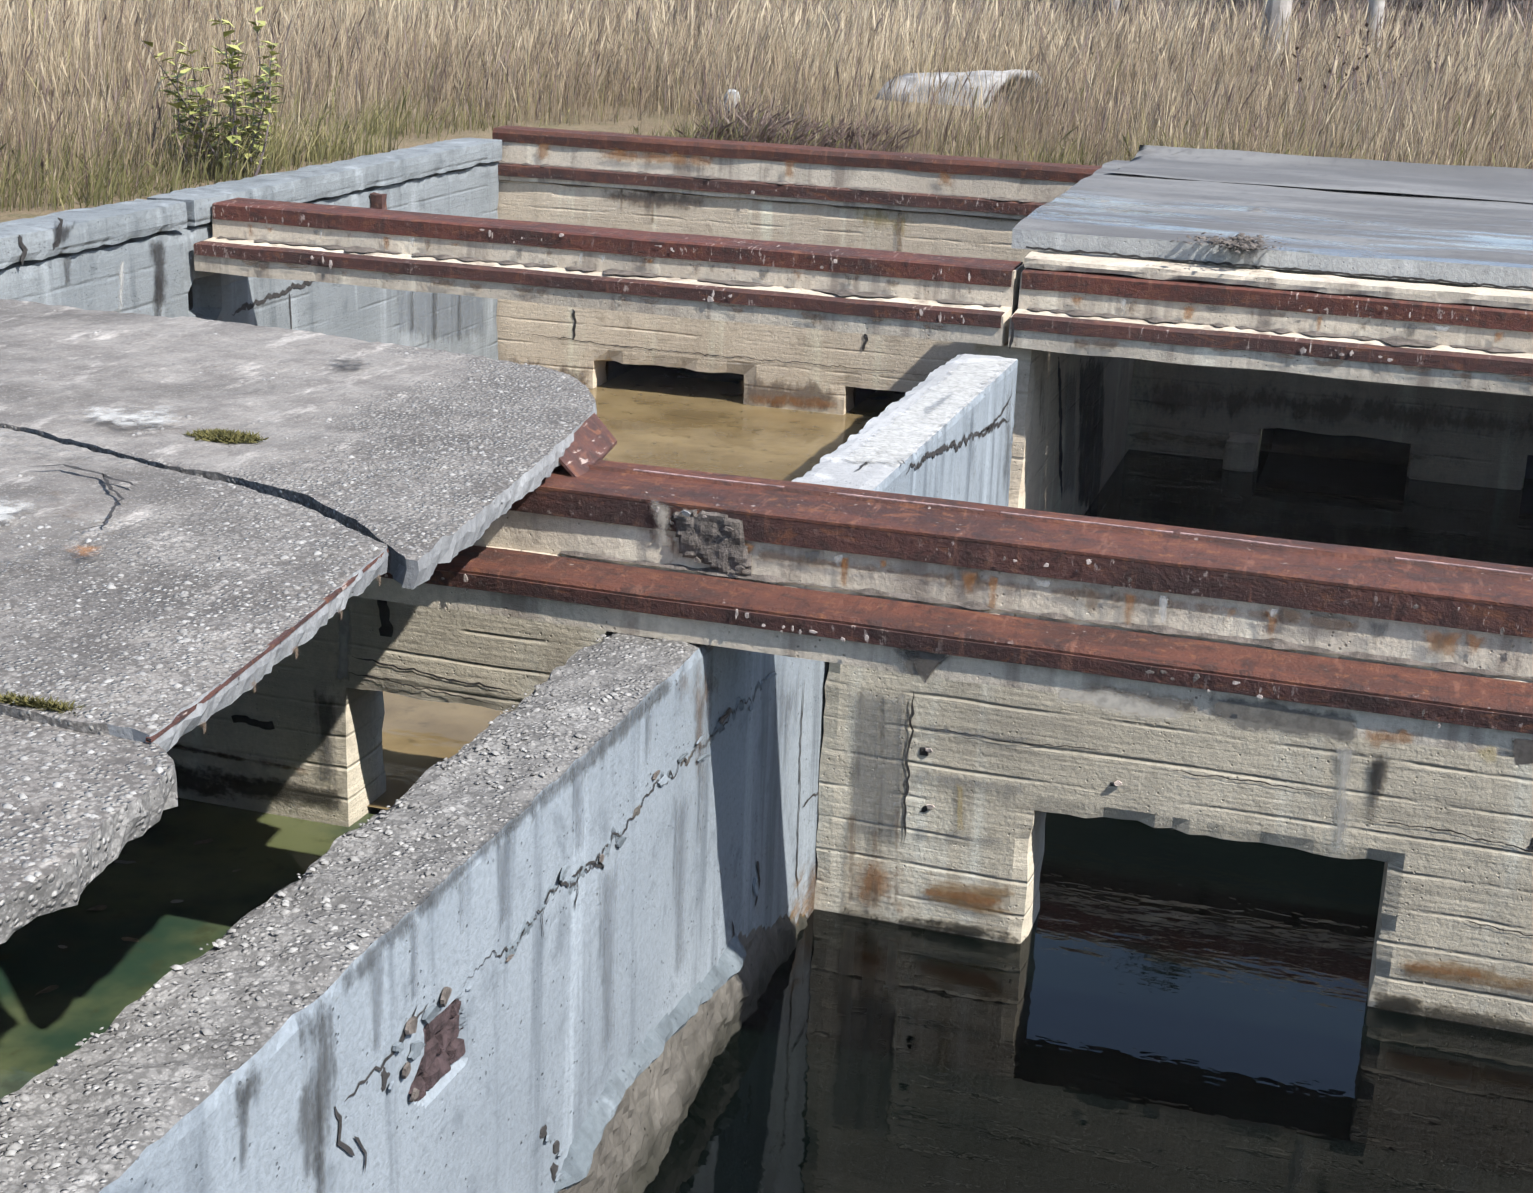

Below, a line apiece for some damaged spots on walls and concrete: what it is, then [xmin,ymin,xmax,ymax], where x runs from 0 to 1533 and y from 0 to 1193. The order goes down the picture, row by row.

crack [232,281,313,329]
crack [855,395,1012,475]
spalling [656,507,752,580]
leakage [175,691,341,810]
spalling [423,677,657,789]
leakage [348,682,671,985]
crack [464,672,819,991]
leakage [791,873,817,918]
rust [926,883,1008,912]
spalling [0,796,471,1193]
rust [1406,962,1533,995]
crack [335,1004,428,1170]